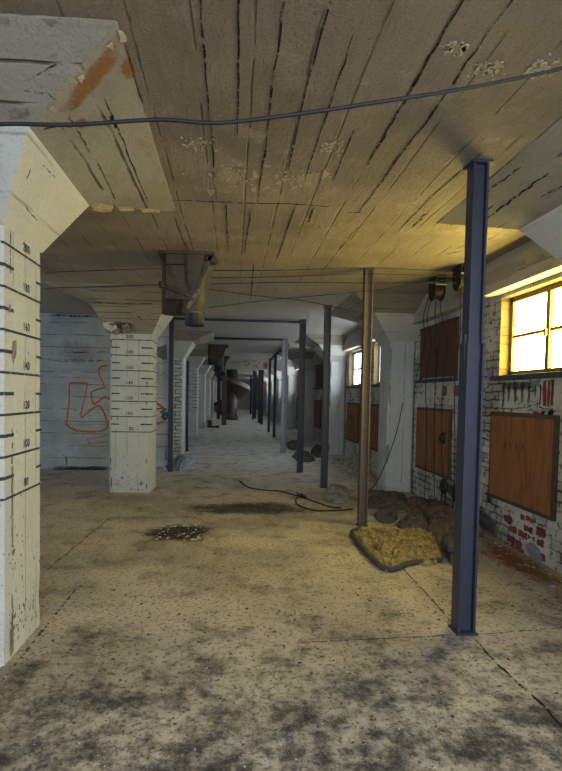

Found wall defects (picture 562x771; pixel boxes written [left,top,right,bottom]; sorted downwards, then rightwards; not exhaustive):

crack [43,116,115,200]
rust [71,50,135,109]
crack [105,100,147,198]
crack [126,46,146,115]
crack [175,0,329,298]
crack [288,2,353,185]
crack [321,0,513,272]
crack [488,167,562,233]
crack [300,569,451,643]
crack [475,627,562,727]